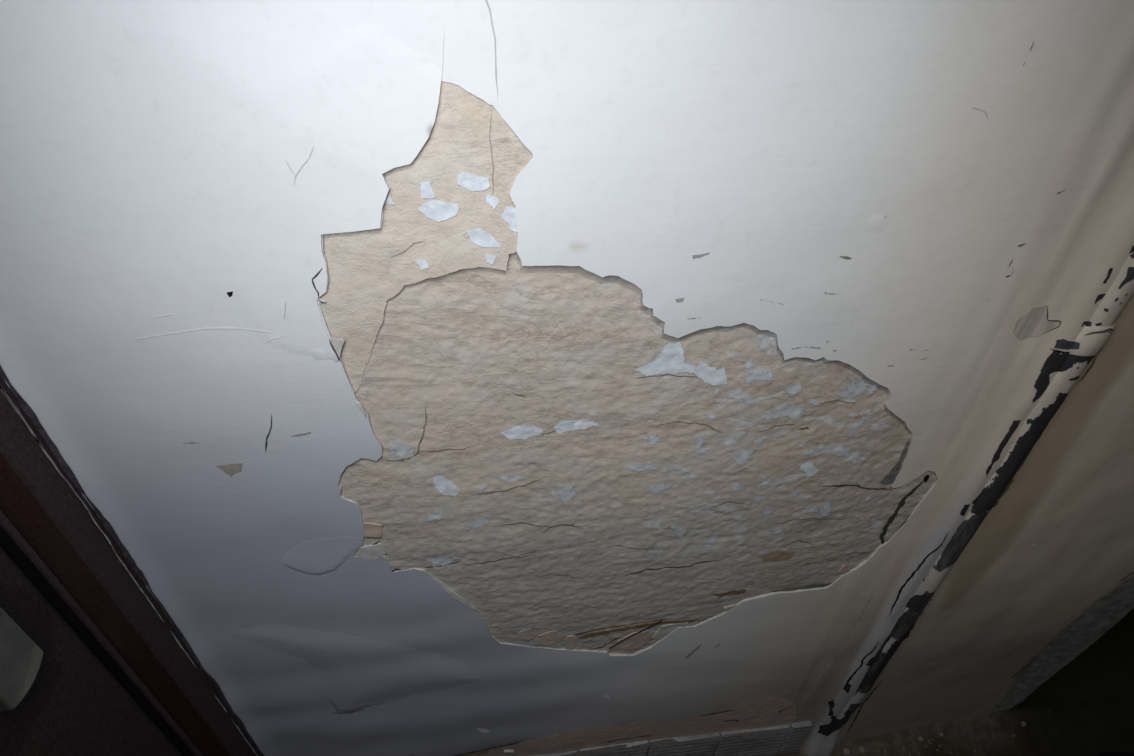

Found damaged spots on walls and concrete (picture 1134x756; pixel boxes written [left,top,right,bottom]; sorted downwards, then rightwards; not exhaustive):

crack [485,0,498,100]
flaking render [312,81,937,654]
peeling [818,305,1093,736]
peeling [1081,245,1134,327]